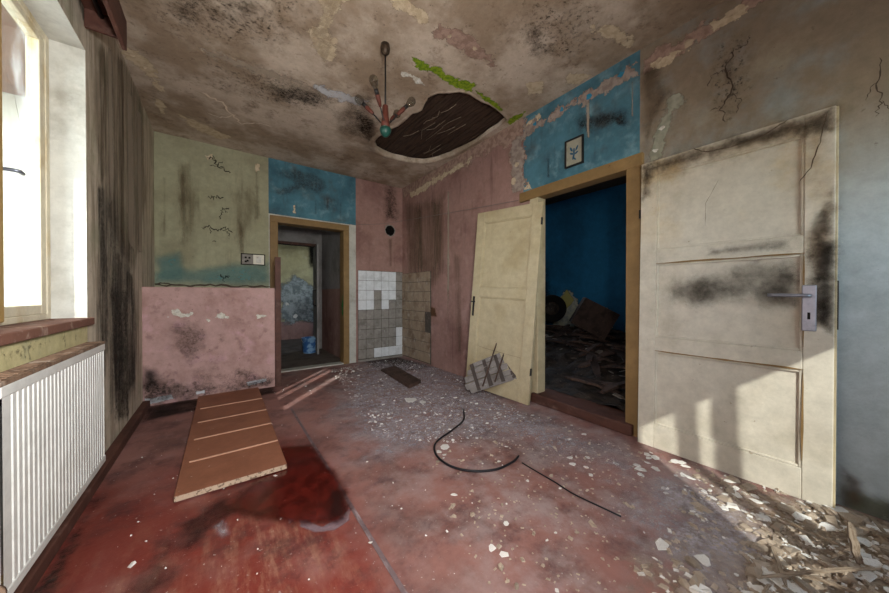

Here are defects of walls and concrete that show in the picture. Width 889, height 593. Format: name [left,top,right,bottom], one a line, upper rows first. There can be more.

flaking render [367,0,765,201]
crack [707,35,750,122]
crack [866,58,889,116]
leakage [98,48,214,420]
crack [203,196,232,242]
peeling [281,275,313,324]